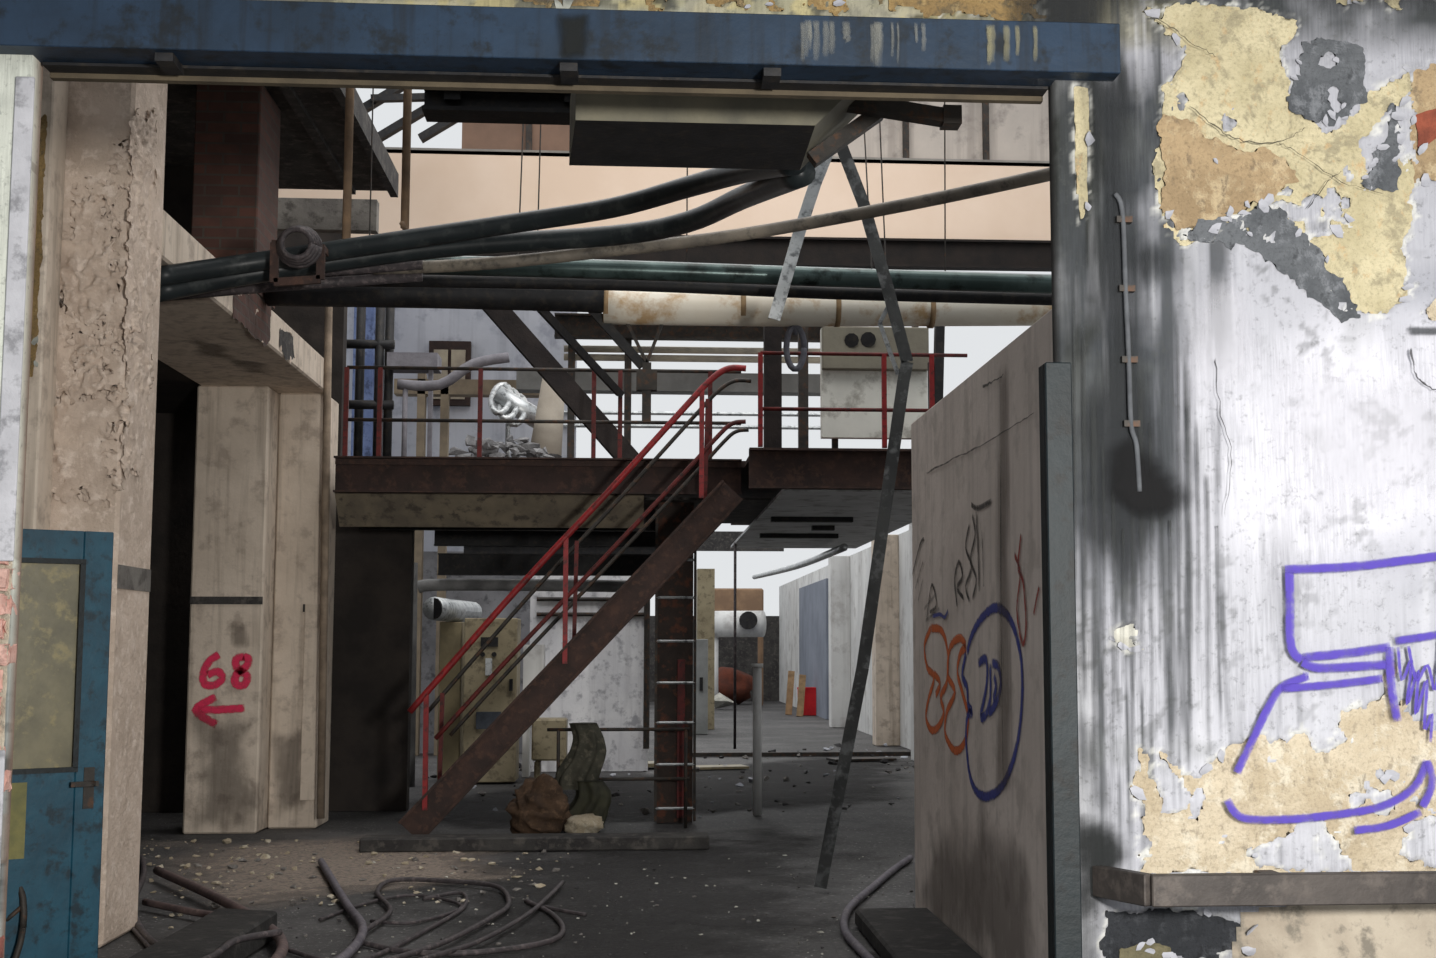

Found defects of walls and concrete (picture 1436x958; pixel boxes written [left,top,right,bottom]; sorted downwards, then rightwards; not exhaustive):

peeling [523,0,600,9]
peeling [706,0,784,12]
peeling [803,0,849,16]
peeling [879,0,1036,21]
peeling [1142,0,1436,323]
leakage [1169,365,1209,532]
flaking render [0,561,20,792]
peeling [1130,662,1436,874]
peeling [1099,907,1241,958]